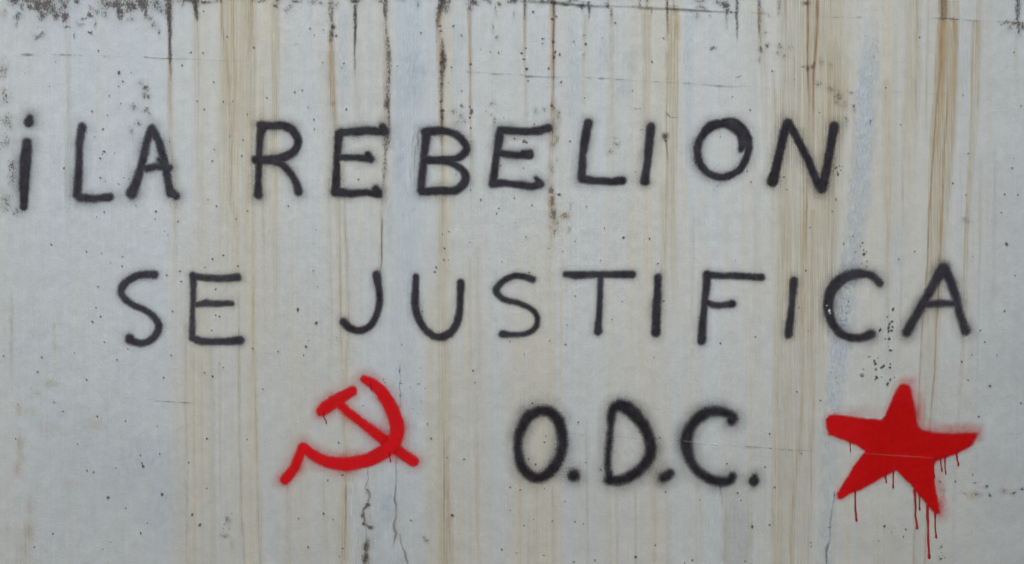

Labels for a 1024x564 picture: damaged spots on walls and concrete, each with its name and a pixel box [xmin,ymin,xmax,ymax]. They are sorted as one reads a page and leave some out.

corrosion [939,0,958,51]
corrosion [436,0,447,127]
crack [361,489,373,563]